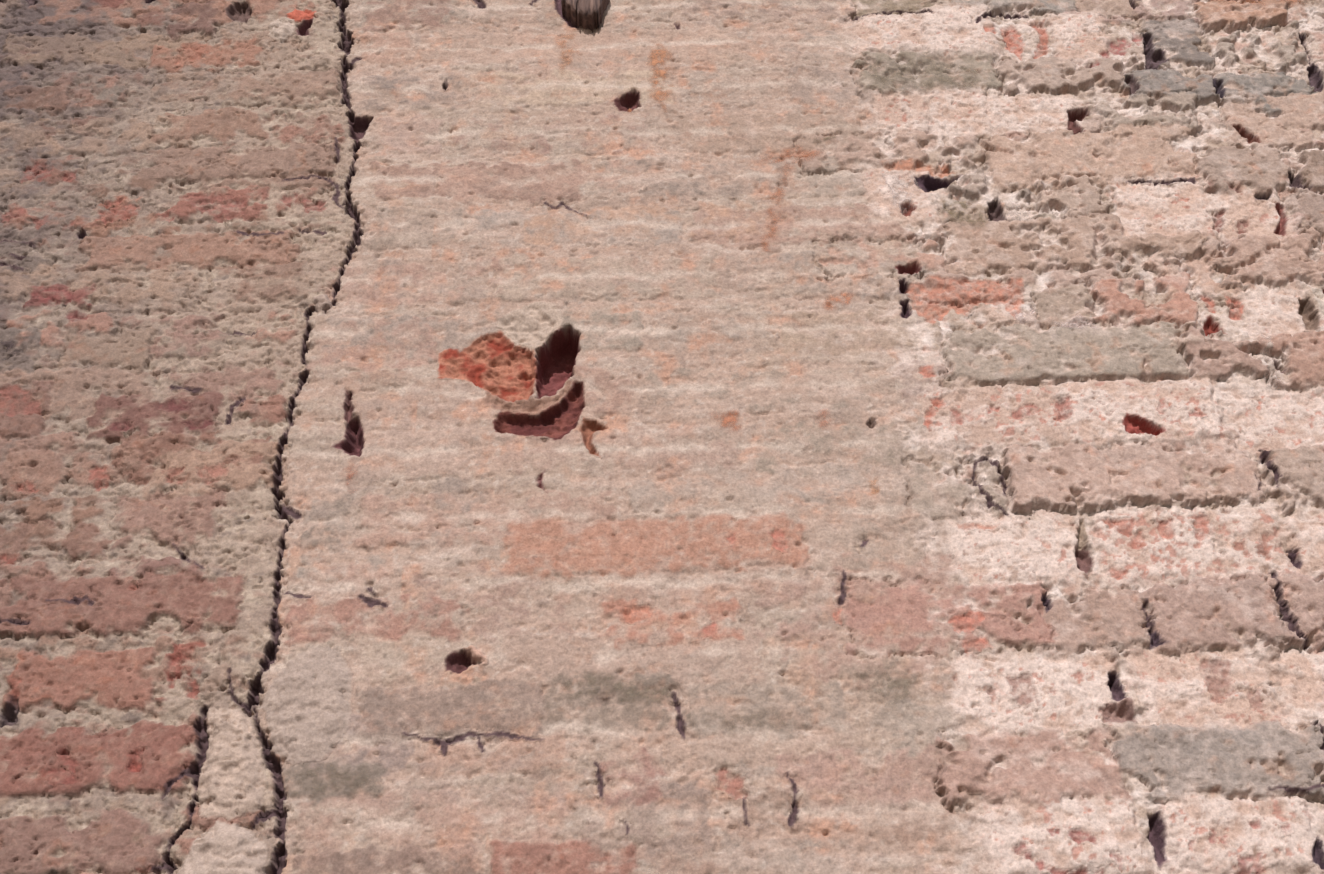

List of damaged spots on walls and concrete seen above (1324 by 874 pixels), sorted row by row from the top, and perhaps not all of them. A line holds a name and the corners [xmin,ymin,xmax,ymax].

spalling [612,87,642,113]
spalling [1310,288,1324,320]
spalling [436,301,612,459]
crack [150,0,372,874]
spalling [443,645,489,674]
crack [400,726,546,760]